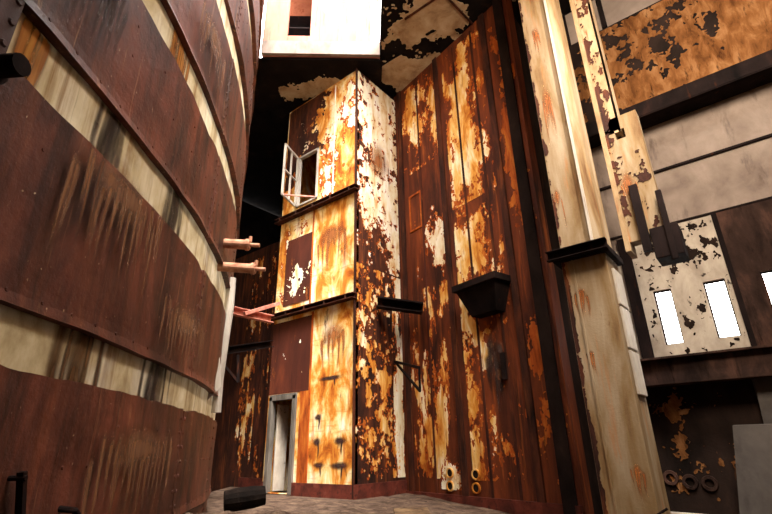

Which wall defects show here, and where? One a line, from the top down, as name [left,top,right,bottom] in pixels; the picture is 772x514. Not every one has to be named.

corrosion [13,18,51,87]
corrosion [170,29,190,82]
peeling [574,0,772,114]
peeling [628,149,652,186]
corrosion [52,146,163,286]
peeling [278,0,504,490]
peeling [636,220,721,287]
corrosion [47,327,105,386]
corrosion [320,325,345,361]
peeling [459,299,524,481]
peeling [680,290,706,335]
corrosion [314,414,347,478]